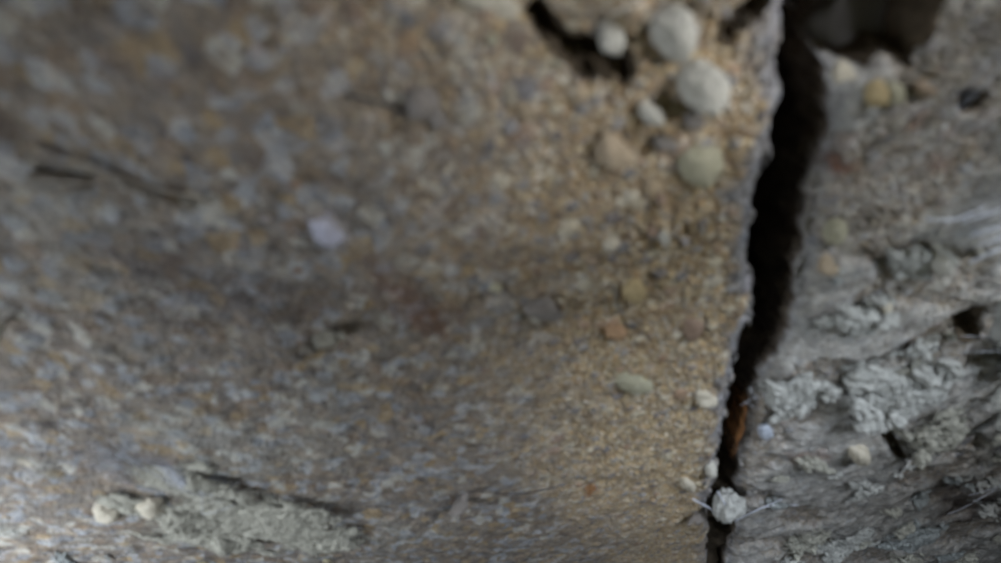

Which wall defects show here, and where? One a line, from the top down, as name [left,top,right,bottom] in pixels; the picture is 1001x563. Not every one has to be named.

peeling [95,454,374,563]
peeling [448,492,469,517]
crack [705,385,747,563]